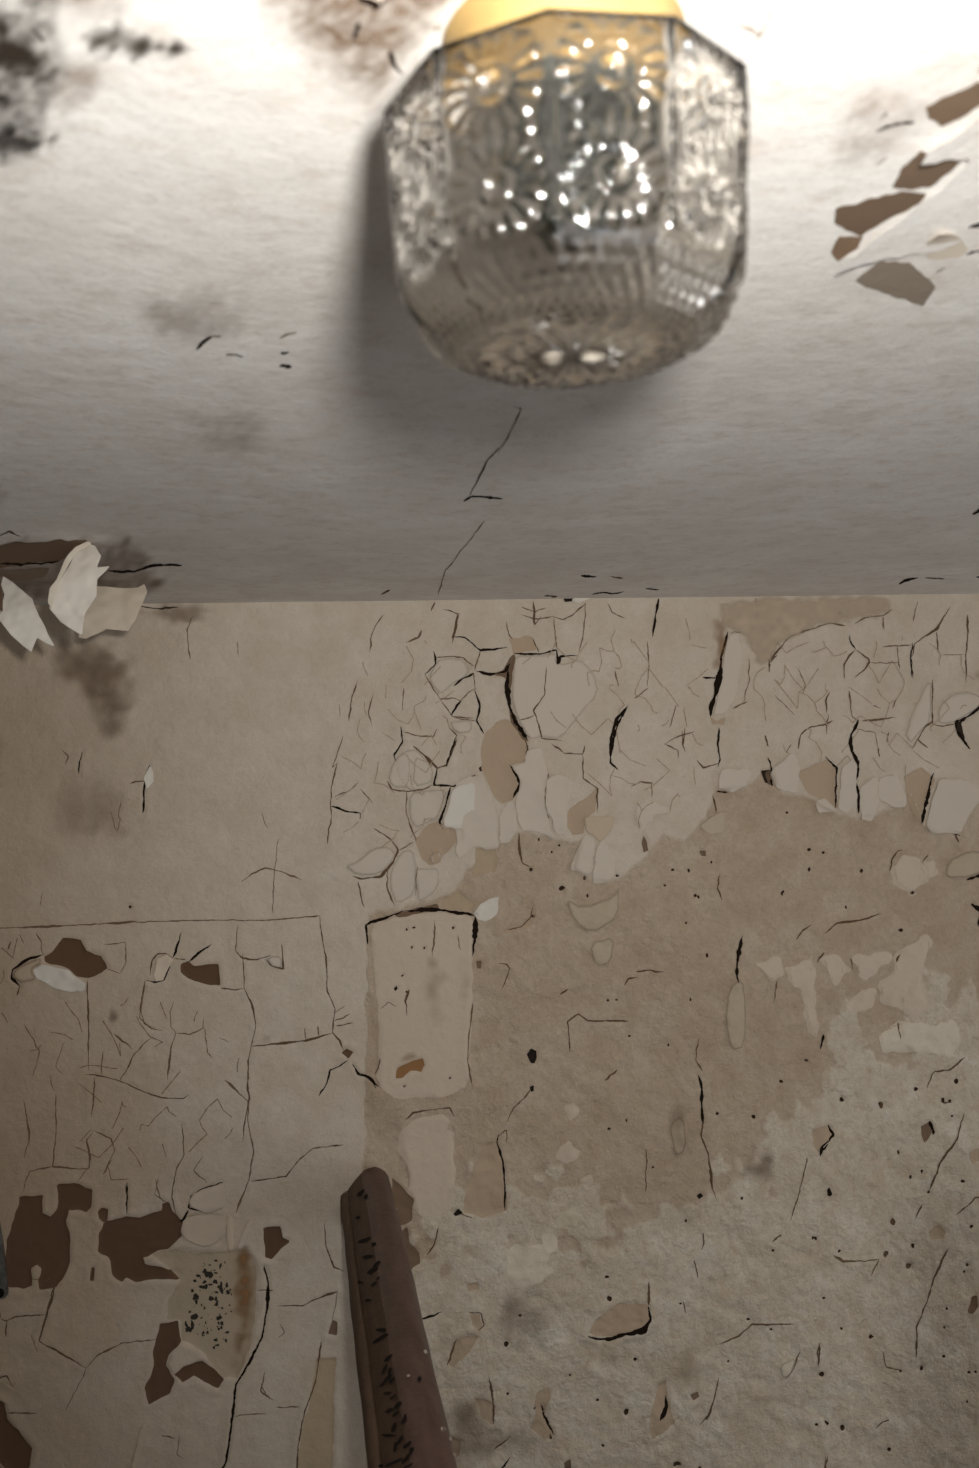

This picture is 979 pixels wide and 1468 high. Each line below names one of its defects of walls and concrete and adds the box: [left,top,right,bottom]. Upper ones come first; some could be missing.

mould [0,15,55,149]
mould [91,30,184,57]
leakage [305,0,431,79]
peeling [831,82,979,306]
peeling [0,539,147,652]
spalling [415,711,619,898]
crack [327,407,979,1120]
spalling [33,938,107,992]
crack [0,812,410,1222]
crack [588,1039,717,1341]
crack [772,1125,835,1242]
spalling [5,1183,289,1404]